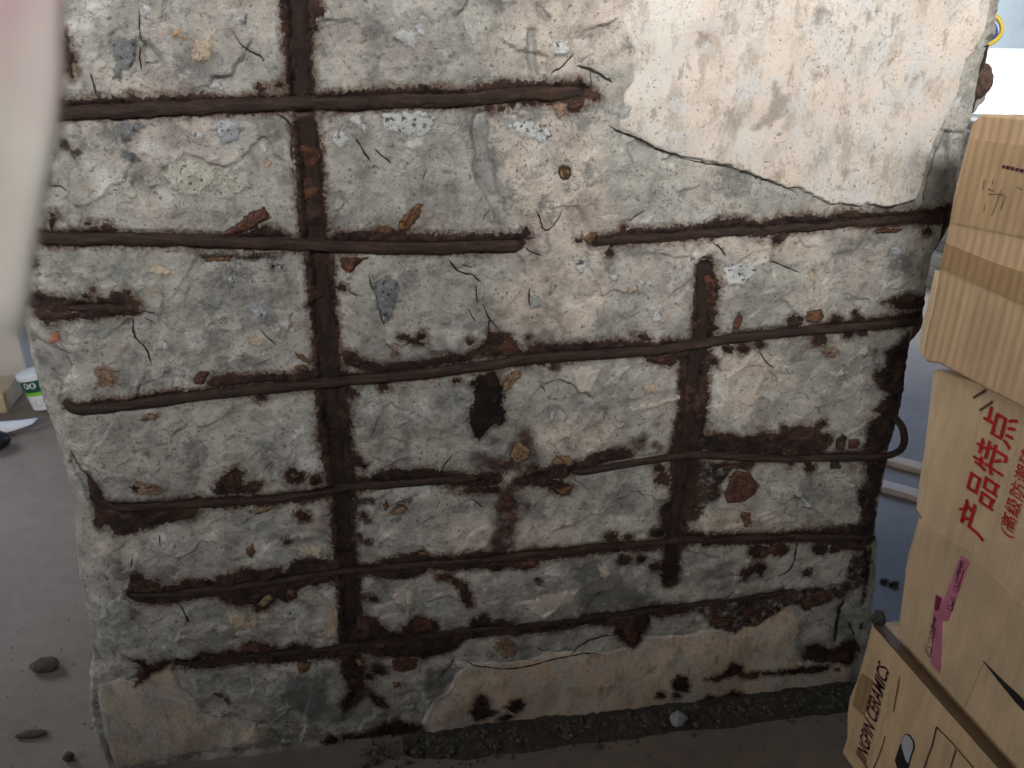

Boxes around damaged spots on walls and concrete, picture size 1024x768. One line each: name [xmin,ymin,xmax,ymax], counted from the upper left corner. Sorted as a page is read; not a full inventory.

spalling [63,0,289,101]
crack [233,32,264,61]
corrosion [59,139,82,159]
spalling [42,111,301,238]
corrosion [63,0,603,252]
crack [608,125,796,193]
corrosion [575,202,953,259]
spalling [312,0,996,564]
crack [132,317,155,365]
spalling [29,244,873,768]
corrosion [30,209,926,746]
crack [442,635,613,676]